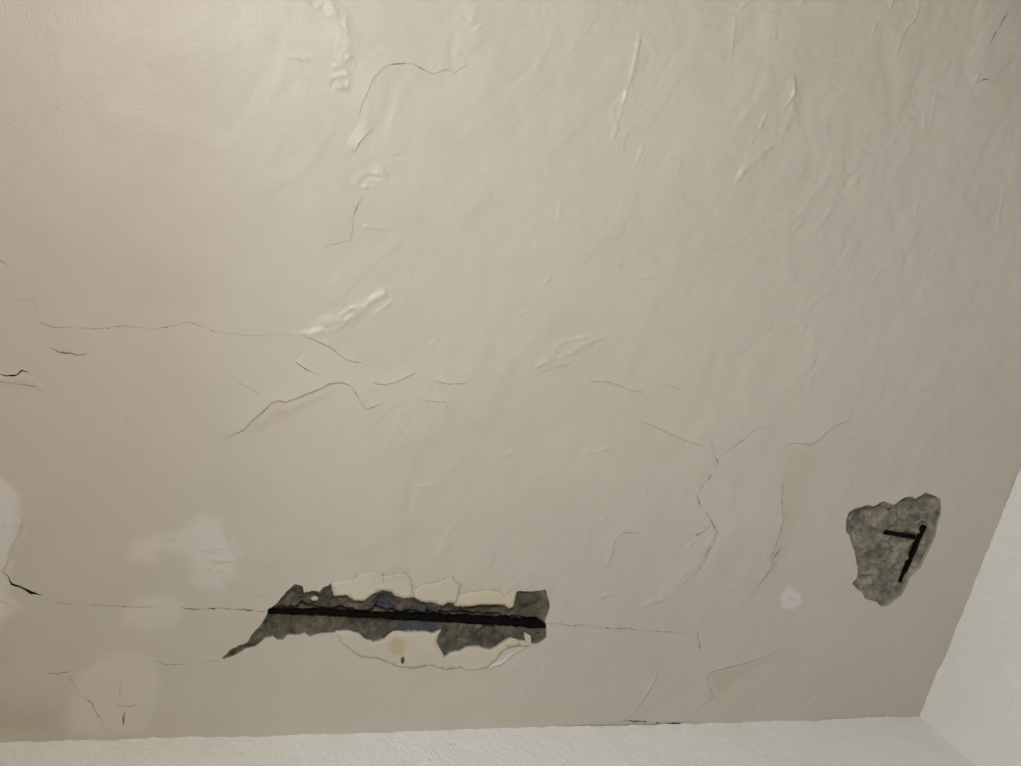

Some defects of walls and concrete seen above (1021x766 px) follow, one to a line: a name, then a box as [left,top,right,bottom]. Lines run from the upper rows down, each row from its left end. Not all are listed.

crack [4,299,291,356]
crack [0,370,37,387]
crack [2,560,155,608]
water stain [0,443,265,743]
crack [184,606,265,614]
spalling [223,571,550,671]
crack [548,623,701,650]
crack [685,426,772,579]
crack [749,462,786,597]
spalling [846,493,941,607]